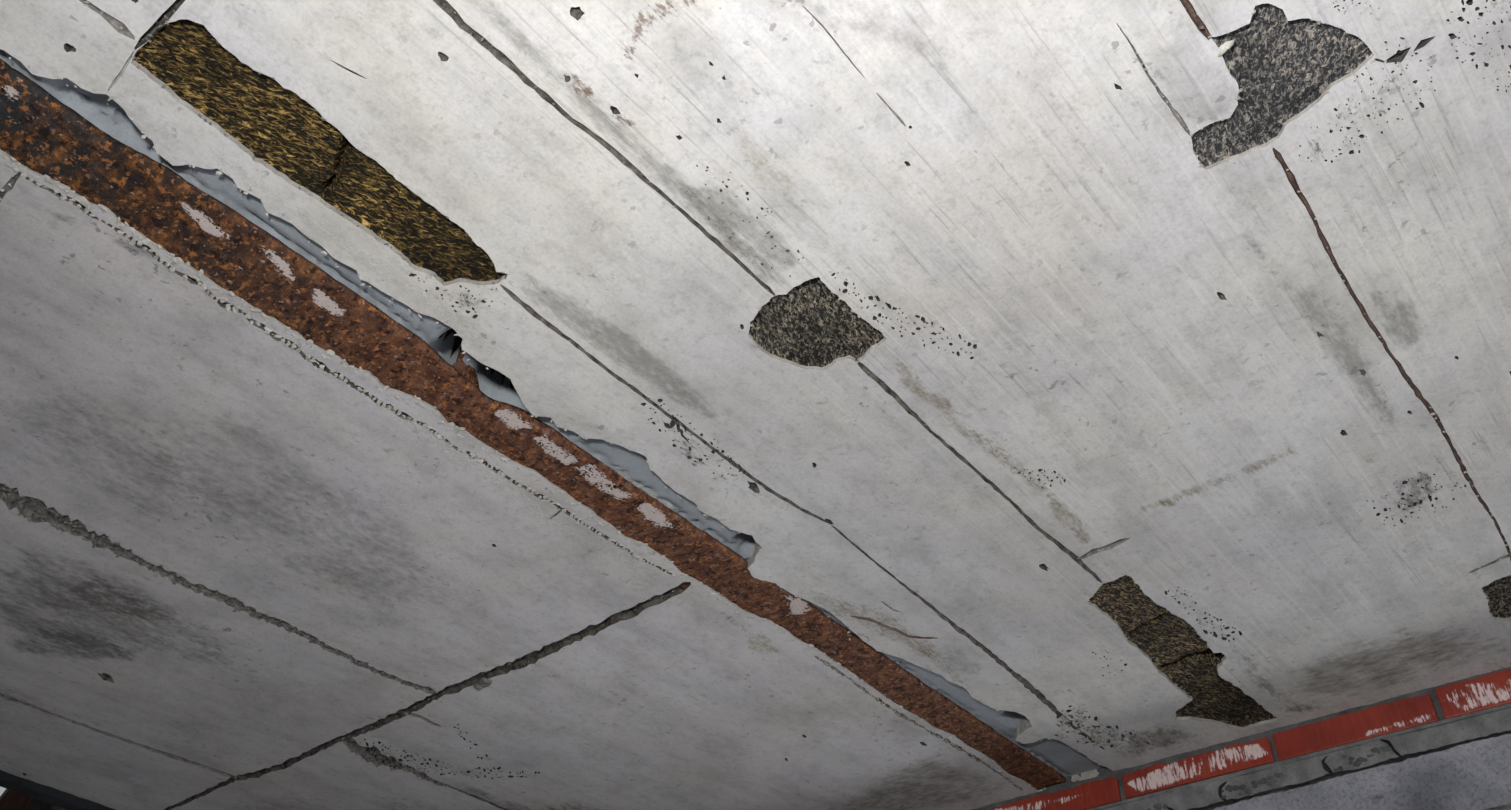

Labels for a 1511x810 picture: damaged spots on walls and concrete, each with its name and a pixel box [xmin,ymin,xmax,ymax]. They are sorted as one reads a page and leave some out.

rust [624,0,694,60]
crack [803,6,906,126]
crack [1116,23,1191,136]
spalling [1189,3,1374,169]
crack [1373,36,1435,64]
crack [4,162,675,577]
spalling [0,19,762,568]
spalling [0,149,1046,792]
crack [0,483,441,727]
spalling [765,580,1104,782]
spalling [1088,575,1281,730]
spalling [1480,575,1511,621]